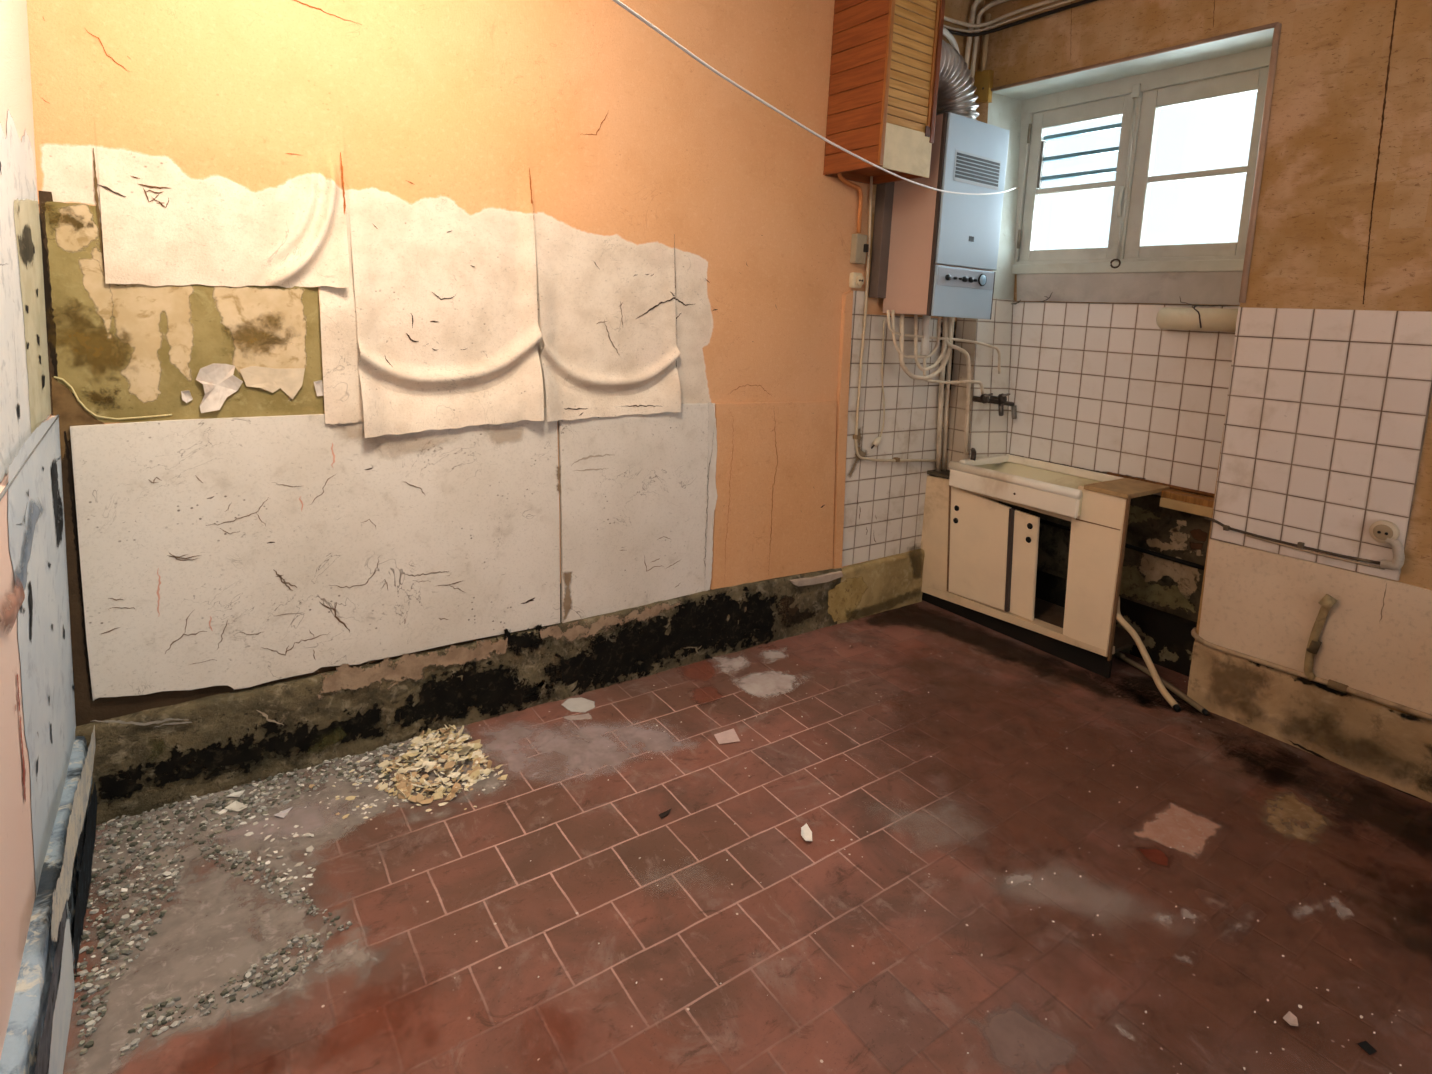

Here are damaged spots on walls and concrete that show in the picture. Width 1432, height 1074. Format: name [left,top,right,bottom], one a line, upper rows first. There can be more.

crack [294,0,360,24]
peeling [529,168,721,591]
flaking render [0,110,681,1074]
peeling [1137,520,1203,604]
peeling [1116,615,1192,662]
damp [1212,660,1274,716]
damp [1294,677,1351,696]
damp [1285,717,1432,788]
damp [34,572,817,1074]